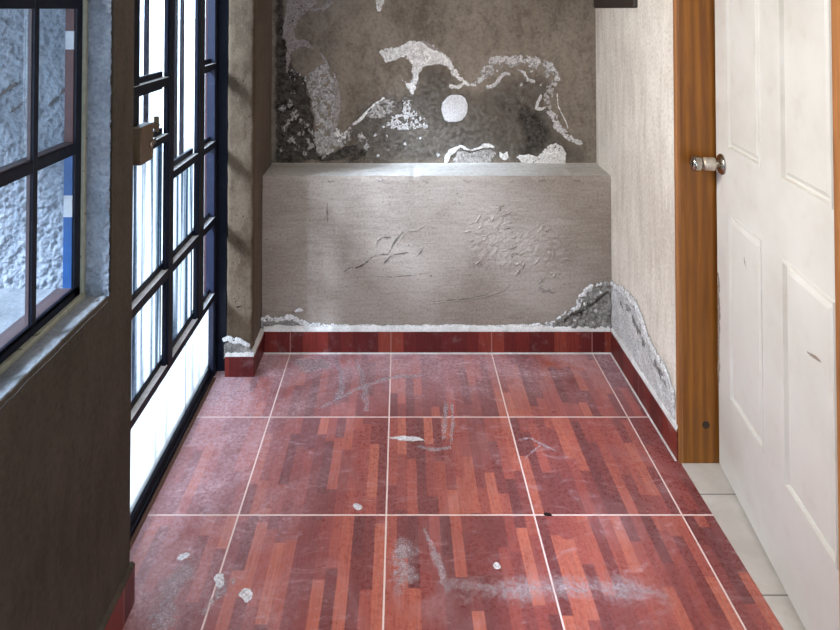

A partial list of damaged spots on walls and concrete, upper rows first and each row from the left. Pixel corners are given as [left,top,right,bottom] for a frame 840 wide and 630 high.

peeling [379,41,476,94]
peeling [444,143,566,164]
crack [344,225,425,277]
flaking render [261,308,338,329]
flaking render [222,336,252,358]
flaking render [548,281,675,421]